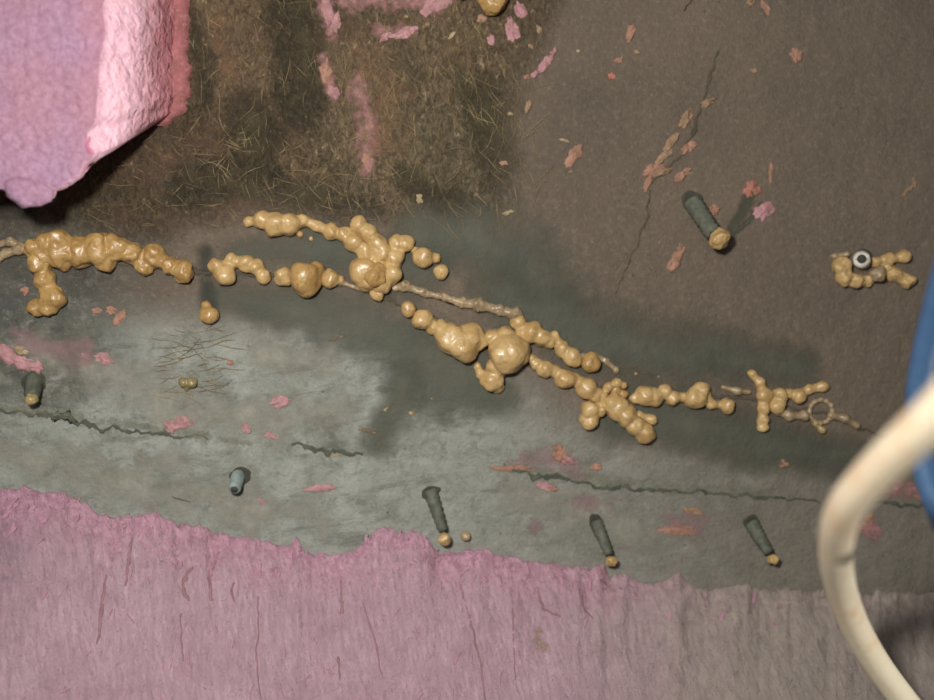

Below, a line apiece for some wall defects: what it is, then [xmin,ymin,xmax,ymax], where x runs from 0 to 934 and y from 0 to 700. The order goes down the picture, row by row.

crack [616,50,719,293]
leakage [232,232,357,270]
crack [236,270,274,278]
leakage [396,211,814,382]
leakage [205,282,514,452]
crack [0,407,208,440]
crack [291,442,363,457]
leakage [599,414,630,436]
leakage [626,389,868,475]
peeling [535,481,560,492]
leakage [501,456,673,550]
crack [504,464,821,504]